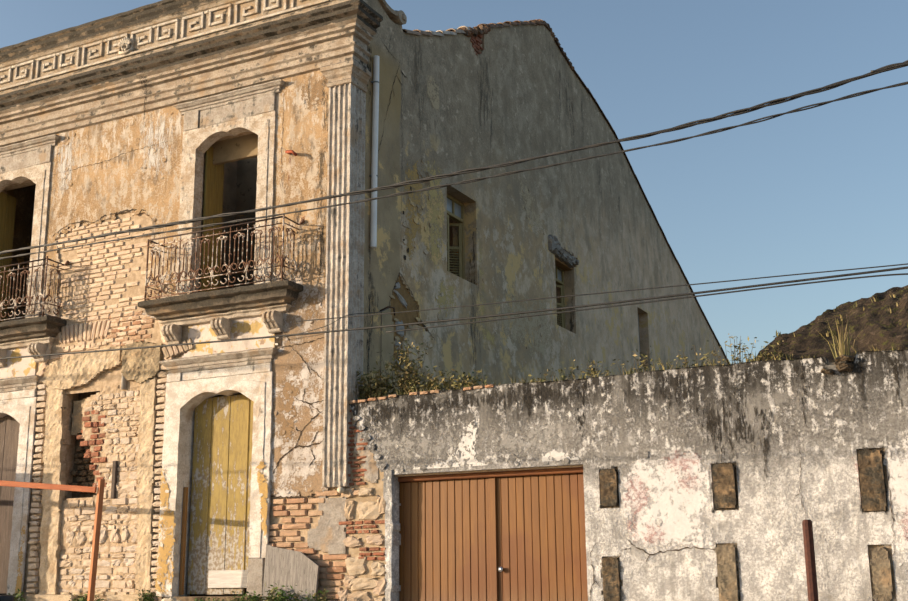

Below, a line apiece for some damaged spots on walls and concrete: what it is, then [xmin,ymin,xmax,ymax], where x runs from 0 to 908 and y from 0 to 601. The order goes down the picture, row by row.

spalling [461,24,491,55]
spalling [36,209,194,397]
spalling [65,365,140,498]
peeling [401,420,486,472]
damp [575,384,589,437]
damp [657,370,773,485]
damp [794,362,811,425]
damp [881,352,908,405]
spalling [256,409,389,601]
crack [623,540,715,562]